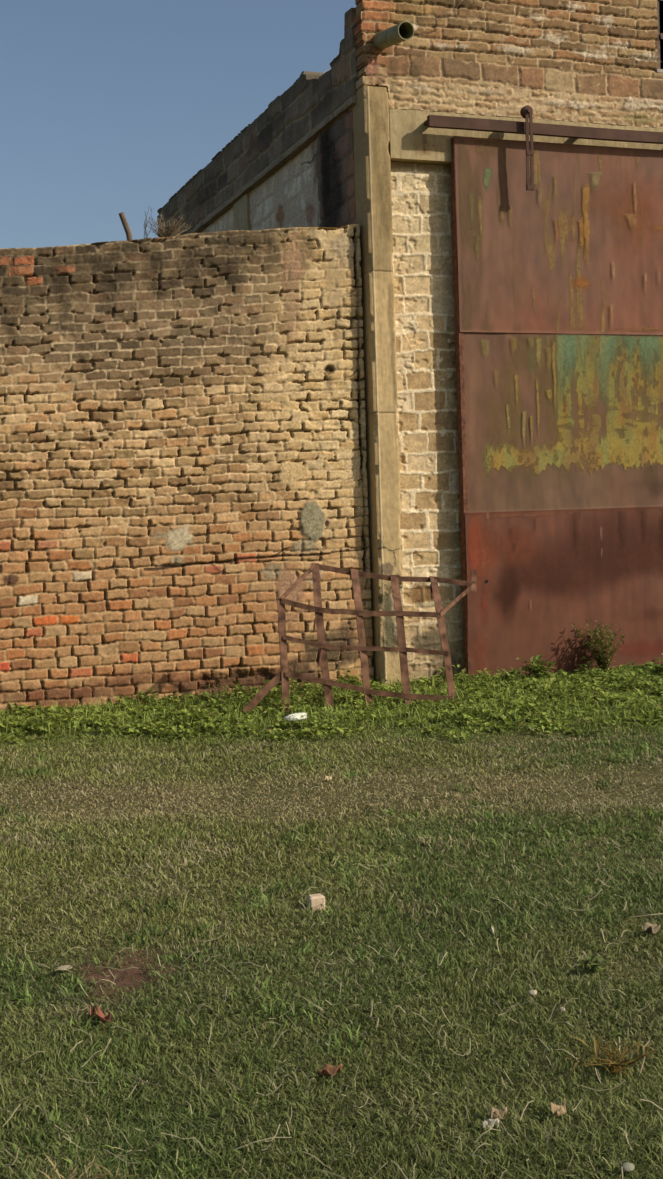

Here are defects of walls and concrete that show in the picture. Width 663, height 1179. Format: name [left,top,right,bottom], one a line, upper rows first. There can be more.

water stain [0,240,162,287]
crack [348,228,356,294]
peeling [486,153,663,475]
crack [346,341,363,468]
crack [144,535,400,574]